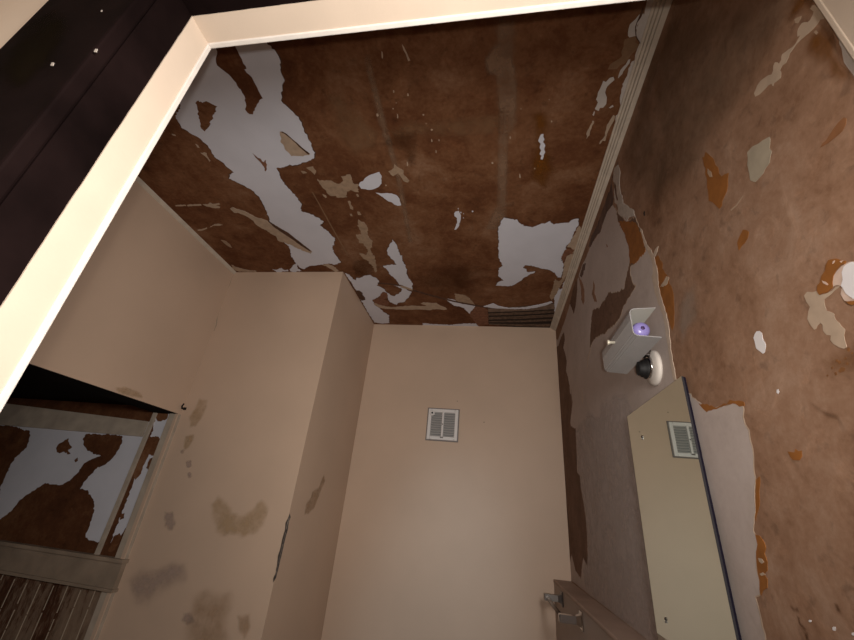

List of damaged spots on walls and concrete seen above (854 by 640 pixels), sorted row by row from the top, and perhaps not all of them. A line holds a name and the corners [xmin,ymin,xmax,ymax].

peeling [833,30,854,78]
peeling [593,59,630,116]
peeling [172,42,413,324]
peeling [747,137,772,182]
peeling [423,294,489,326]
spalling [817,259,854,305]
peeling [753,331,766,353]
flaking render [496,175,677,640]
peeling [0,413,169,552]
flaking render [689,393,766,640]
crack [273,514,291,582]